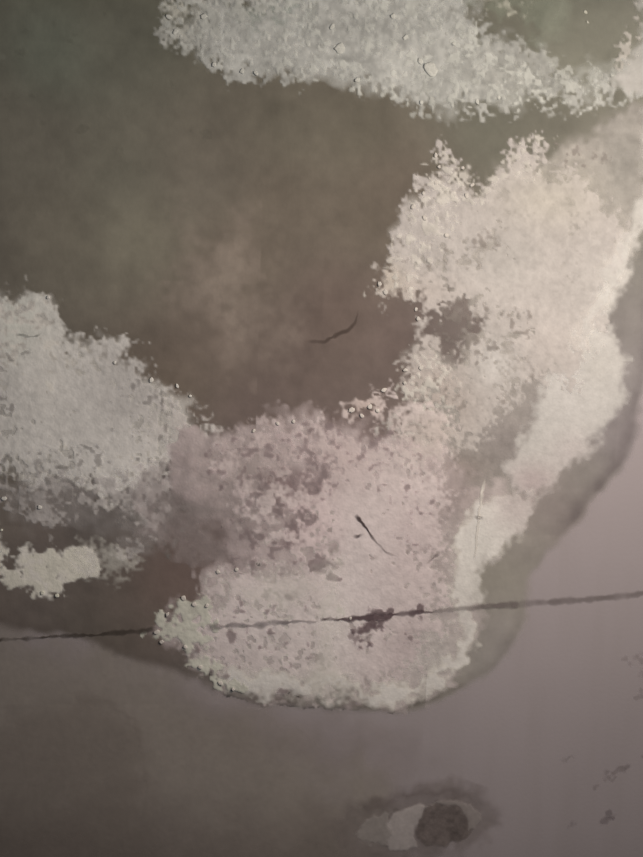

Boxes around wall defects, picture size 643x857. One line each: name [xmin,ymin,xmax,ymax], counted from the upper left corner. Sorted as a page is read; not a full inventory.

water stain [0,0,643,532]
crack [41,628,152,638]
water stain [0,460,391,857]
water stain [153,402,533,711]
crack [323,604,432,648]
water stain [265,231,643,712]
crack [480,601,518,609]
flaking render [334,780,496,857]